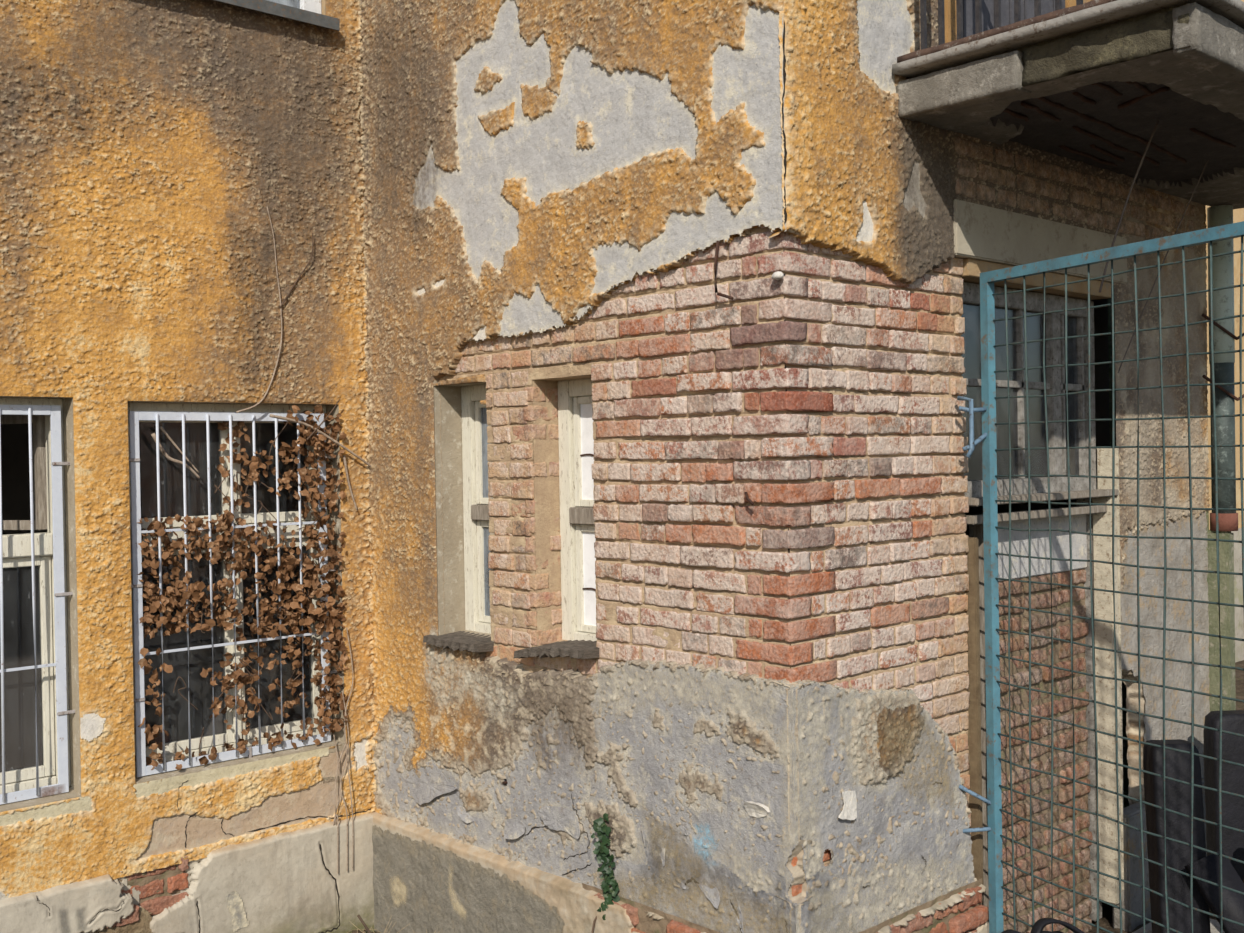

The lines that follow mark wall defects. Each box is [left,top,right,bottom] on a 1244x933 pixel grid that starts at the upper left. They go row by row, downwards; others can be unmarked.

flaking render [88,0,989,933]
crack [780,22,788,224]